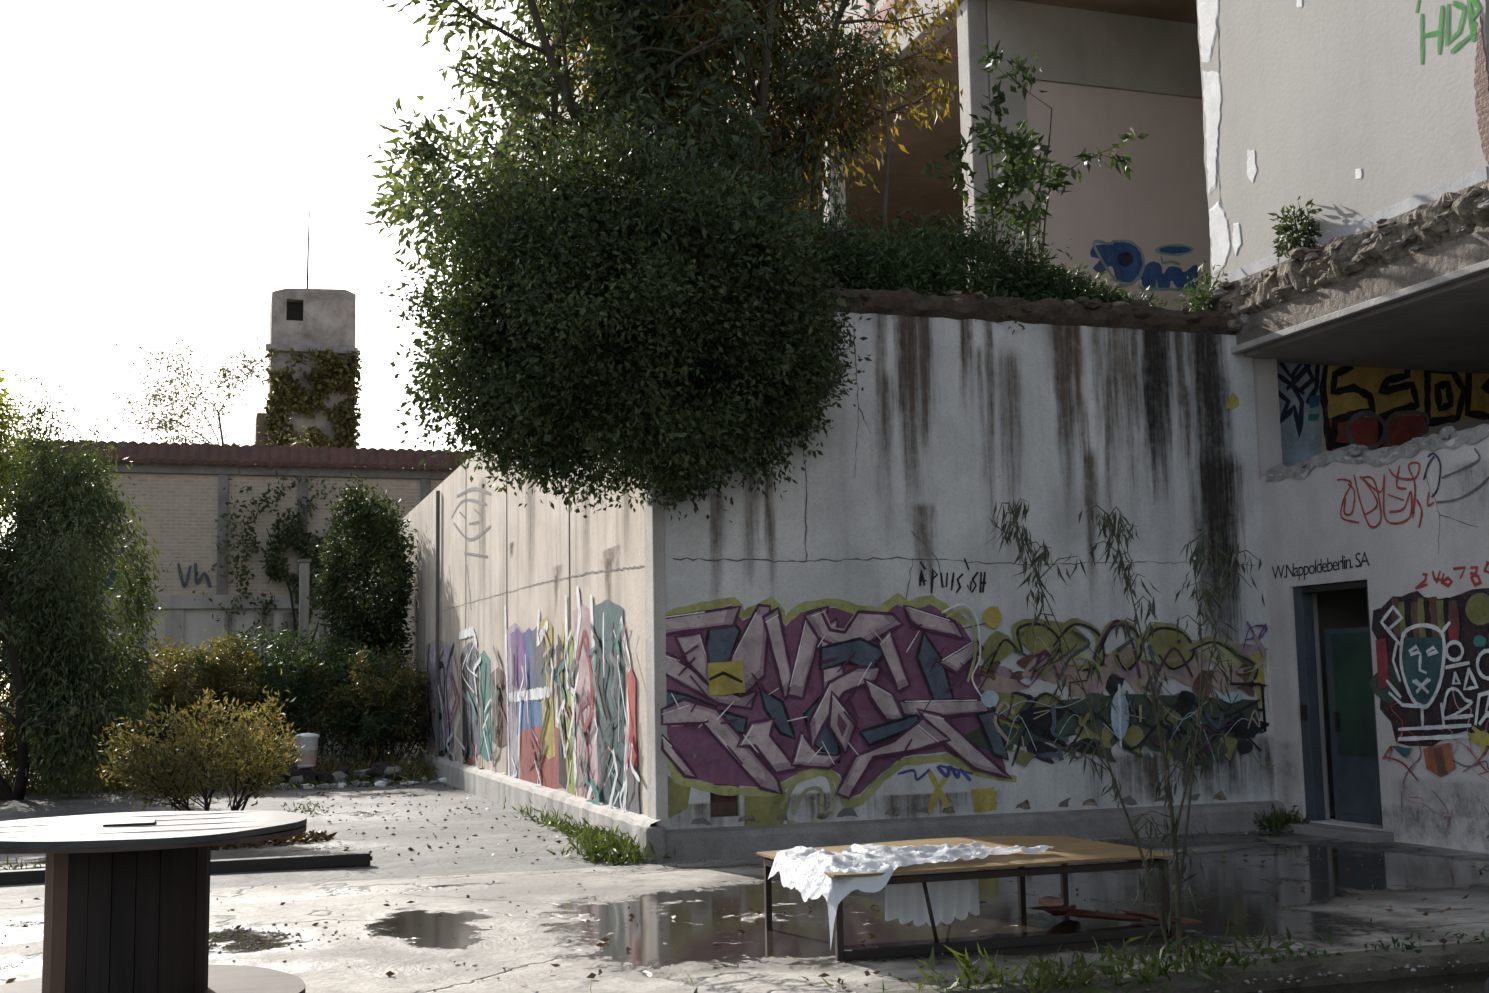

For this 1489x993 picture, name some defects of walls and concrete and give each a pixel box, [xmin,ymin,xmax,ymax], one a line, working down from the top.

spalling [810,0,1489,335]
leakage [878,315,930,450]
leakage [978,321,1018,437]
leakage [746,472,773,552]
leakage [1106,328,1239,619]